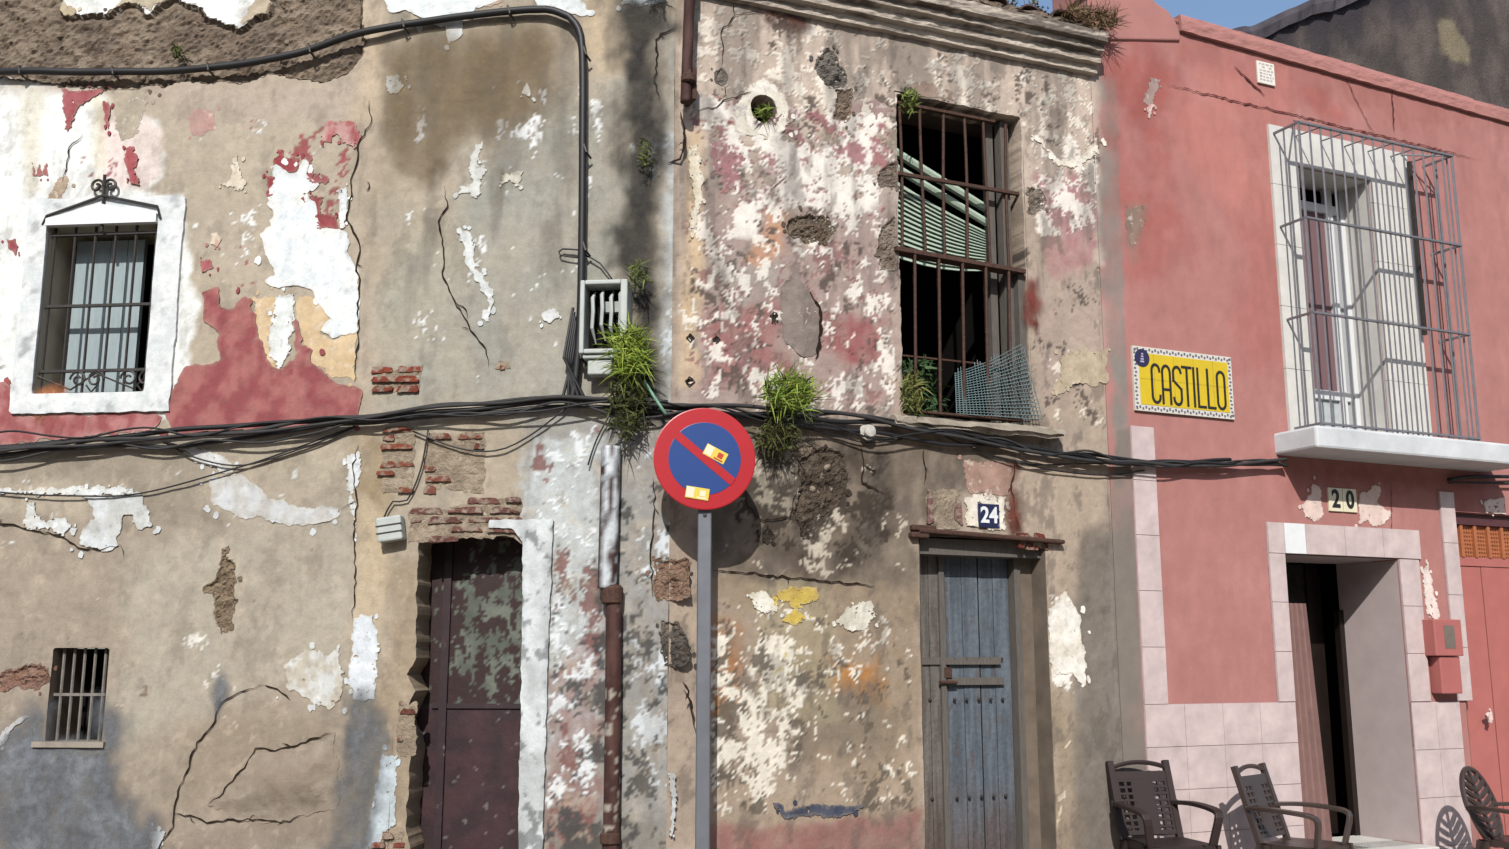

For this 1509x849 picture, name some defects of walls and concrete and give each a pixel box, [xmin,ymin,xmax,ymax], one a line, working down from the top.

spalling [0,0,367,186]
peeling [0,120,524,543]
peeling [384,0,503,51]
crack [438,187,489,367]
peeling [535,0,596,17]
water stain [614,0,676,420]
peeling [688,77,798,238]
spalling [809,45,891,129]
peeling [0,484,162,558]
peeling [1048,591,1091,687]
water stain [0,709,156,849]
crack [158,685,330,849]